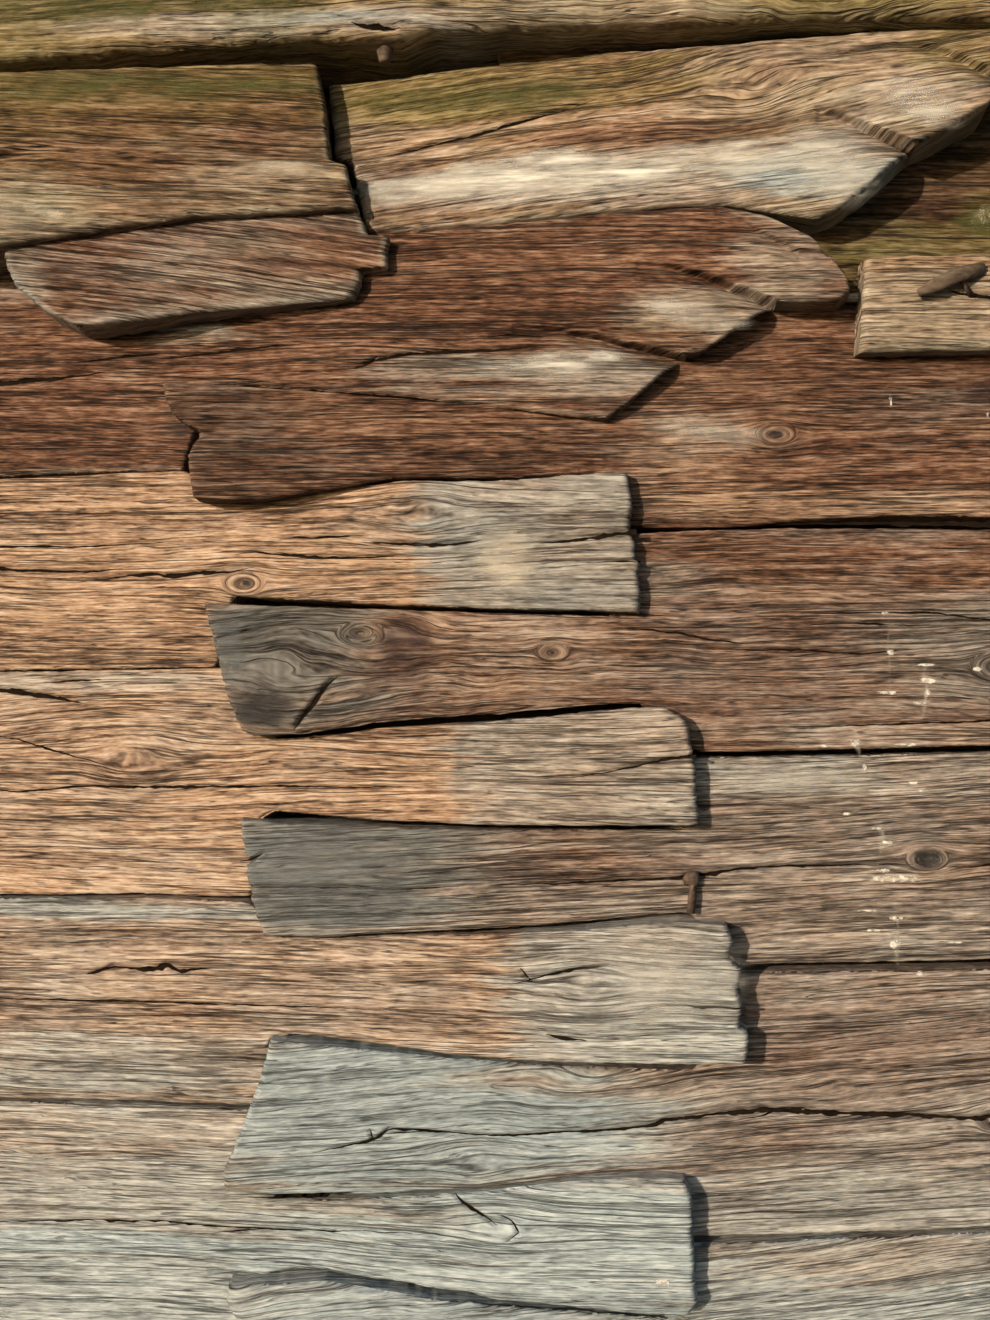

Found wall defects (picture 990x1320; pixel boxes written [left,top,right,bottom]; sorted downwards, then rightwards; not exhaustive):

crack [293,677,337,730]
crack [0,963,411,1012]
crack [314,1107,990,1153]
crack [454,1193,519,1241]